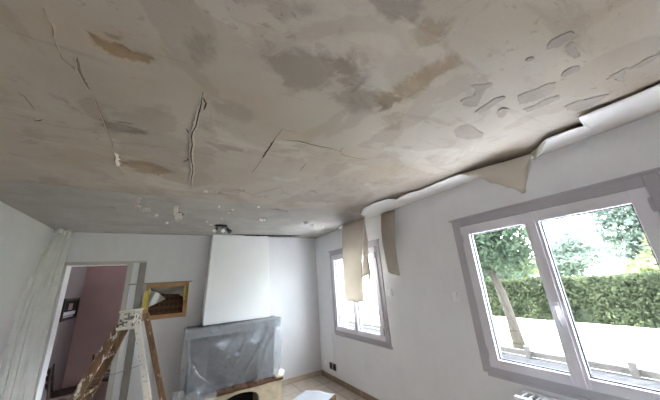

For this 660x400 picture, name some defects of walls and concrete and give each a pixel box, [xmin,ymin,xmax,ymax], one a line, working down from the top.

crack [43,8,90,90]
damp [90,33,152,63]
peeling [547,31,581,77]
peeling [460,83,509,118]
peeling [517,82,560,112]
peeling [565,94,609,111]
crack [183,92,207,189]
crack [253,130,362,172]
peeling [454,124,483,139]